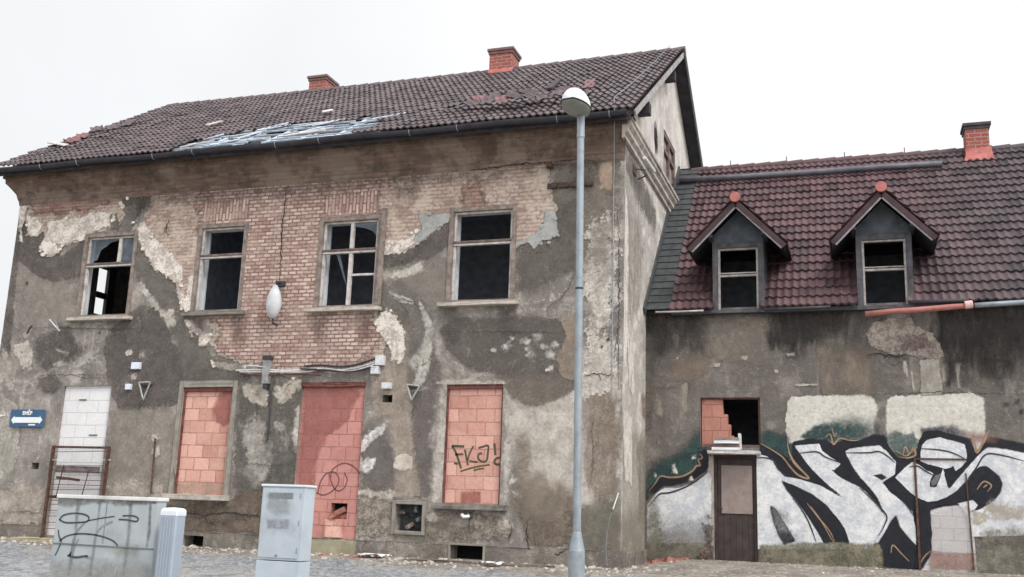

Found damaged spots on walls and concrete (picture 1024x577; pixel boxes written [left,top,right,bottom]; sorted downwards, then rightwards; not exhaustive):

flaking render [18,165,560,446]
damp [104,145,715,555]
damp [768,311,861,394]
flaking render [865,317,944,360]